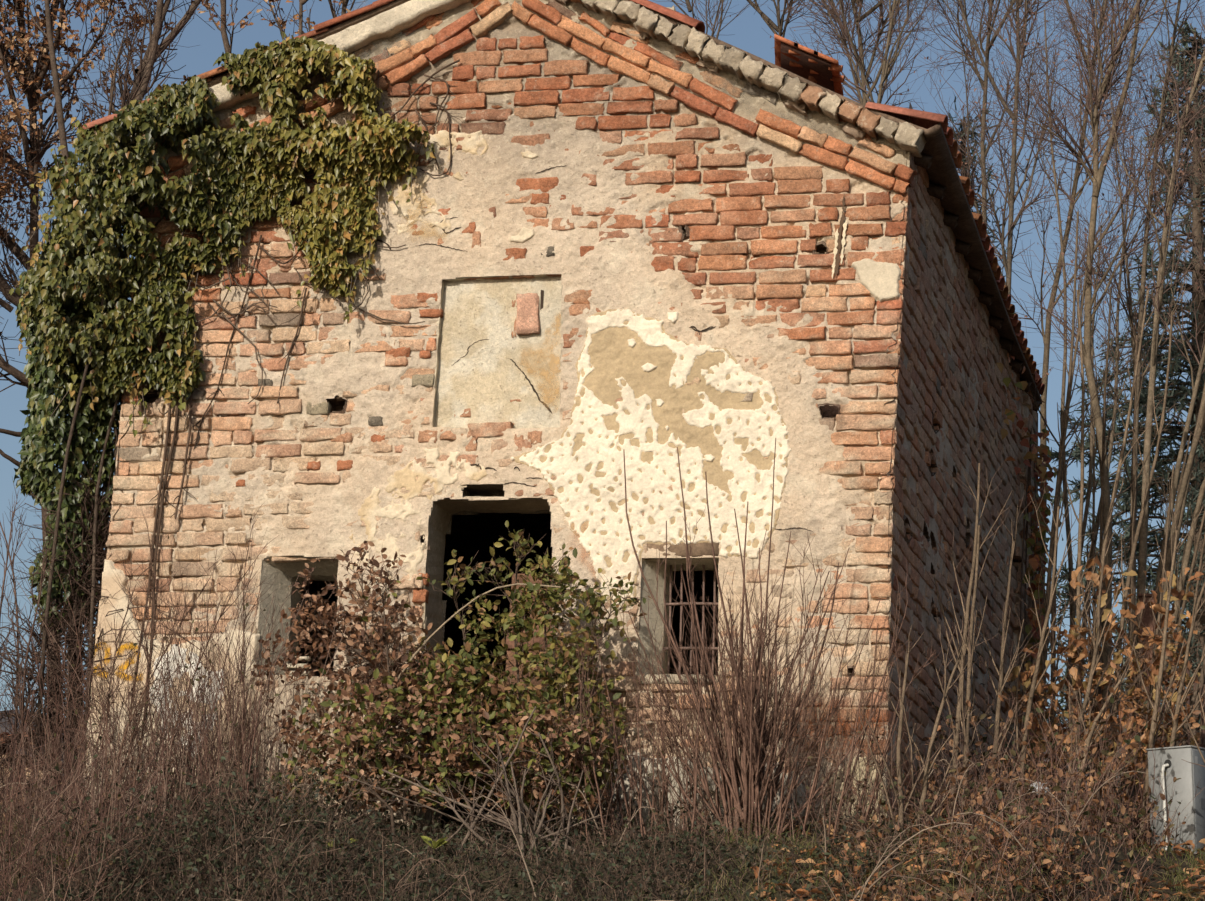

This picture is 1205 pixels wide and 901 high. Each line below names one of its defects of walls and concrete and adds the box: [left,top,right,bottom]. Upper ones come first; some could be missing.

spalling [678,225,690,240]
spalling [811,241,830,254]
crack [453,339,552,413]
peeling [511,309,791,616]
peeling [349,448,488,581]